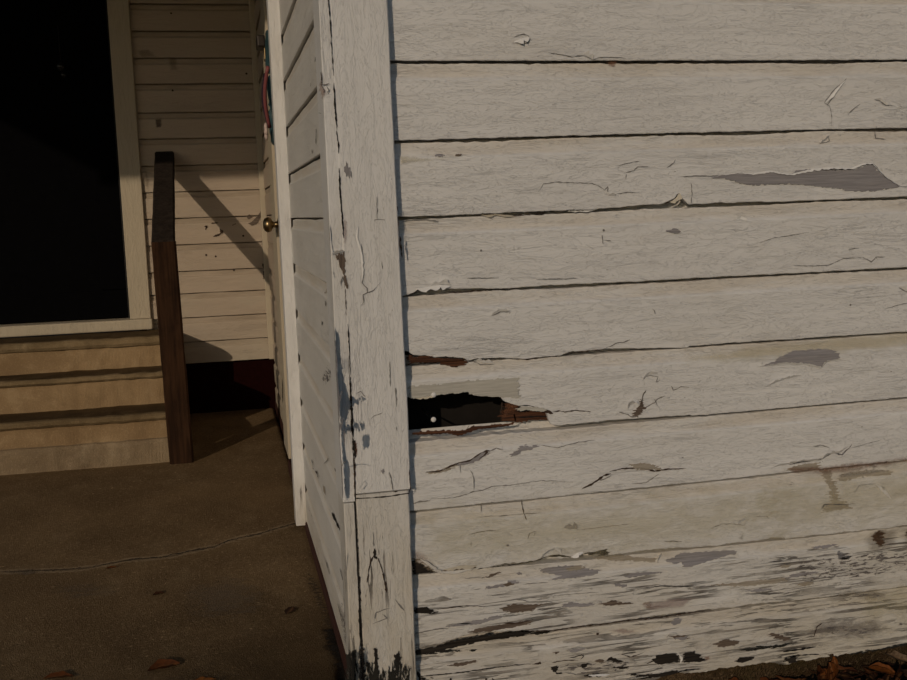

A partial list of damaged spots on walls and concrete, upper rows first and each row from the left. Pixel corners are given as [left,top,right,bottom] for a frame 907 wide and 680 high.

peeling [680,163,907,192]
peeling [760,348,840,386]
peeling [819,469,893,513]
crack [0,522,296,575]
peeling [412,540,737,589]
peeling [641,544,907,600]
peeling [446,592,651,627]
peeling [667,618,688,640]
damp [365,648,432,680]
peeling [551,647,642,677]